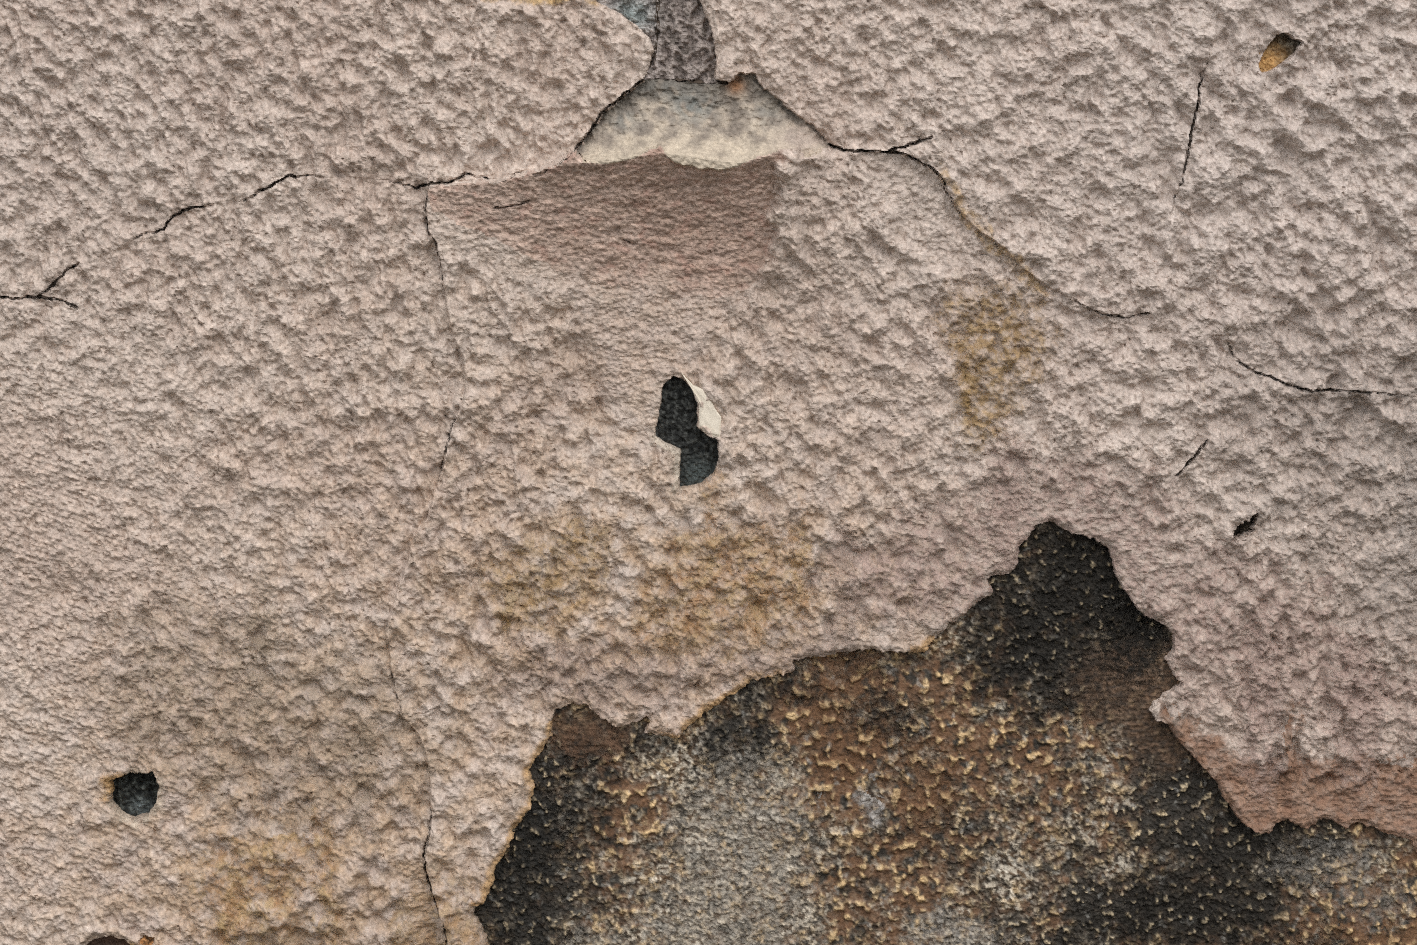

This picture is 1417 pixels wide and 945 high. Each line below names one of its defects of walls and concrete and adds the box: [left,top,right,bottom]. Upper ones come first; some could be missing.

spalling [576,0,830,172]
spalling [1258,33,1301,72]
crack [245,175,307,199]
crack [396,0,727,276]
crack [829,138,960,213]
crack [1174,62,1208,197]
crack [0,266,76,308]
spalling [651,374,721,489]
crack [1177,442,1206,475]
peeling [474,521,1417,945]
spalling [101,771,163,828]
peeling [87,935,154,945]